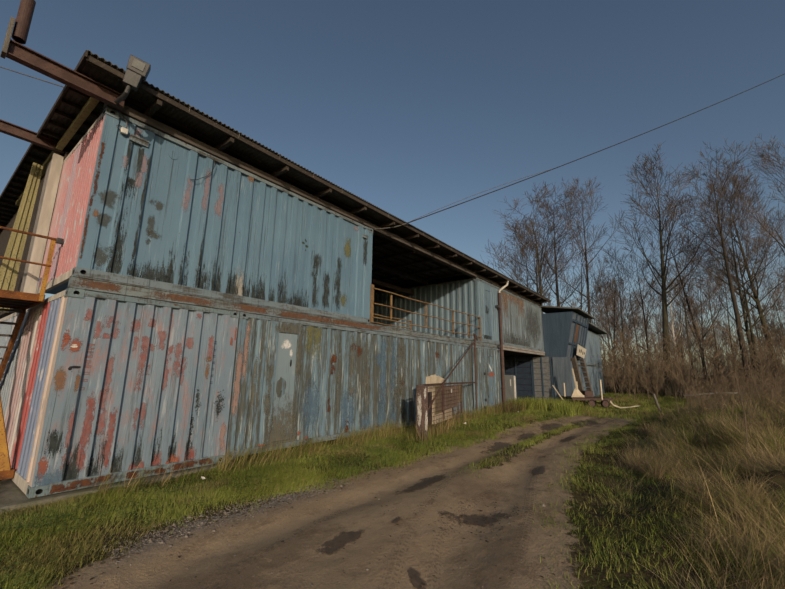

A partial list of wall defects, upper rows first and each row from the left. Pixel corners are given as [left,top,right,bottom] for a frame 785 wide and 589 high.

rust [80,142,105,259]
water stain [94,140,341,311]
rust [149,291,215,305]
peeling [61,309,121,470]
peeling [131,318,194,391]
peeling [230,323,273,416]
peeling [275,323,305,378]
peeling [37,457,48,483]
rust [50,474,112,494]
water stain [44,429,124,481]
water stain [133,390,201,467]
rust [149,458,213,474]